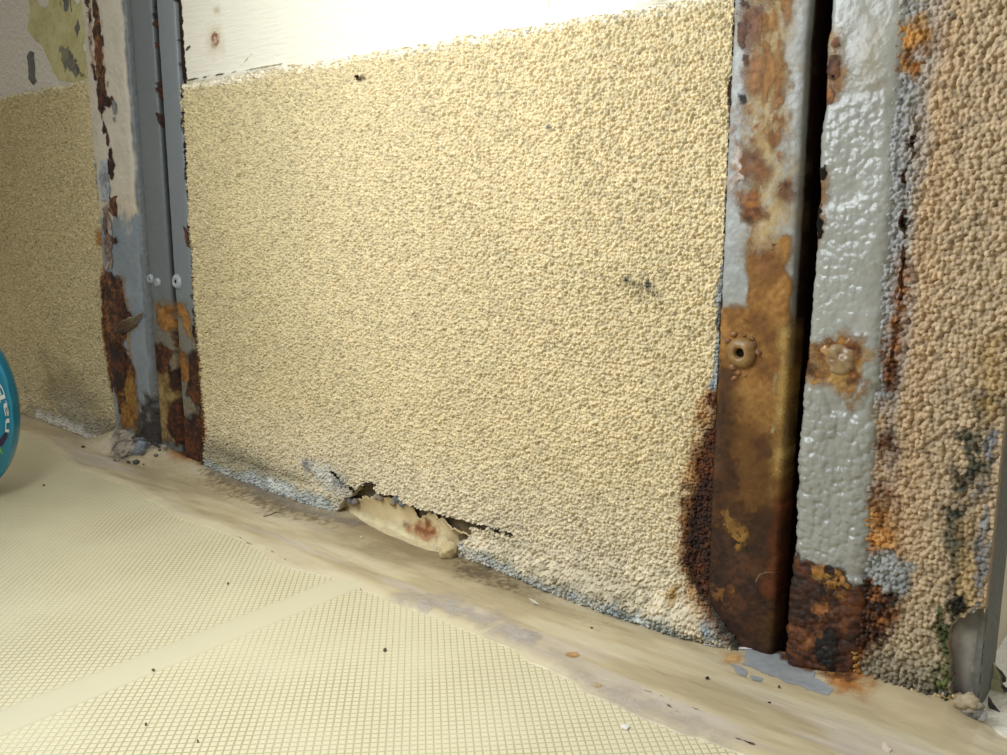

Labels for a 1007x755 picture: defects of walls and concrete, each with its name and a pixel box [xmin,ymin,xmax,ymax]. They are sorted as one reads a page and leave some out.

peeling [27,0,88,84]
corrosion [84,0,117,180]
corrosion [896,13,931,76]
corrosion [96,196,138,431]
corrosion [155,224,205,465]
corrosion [667,0,899,693]
spalling [343,484,472,559]